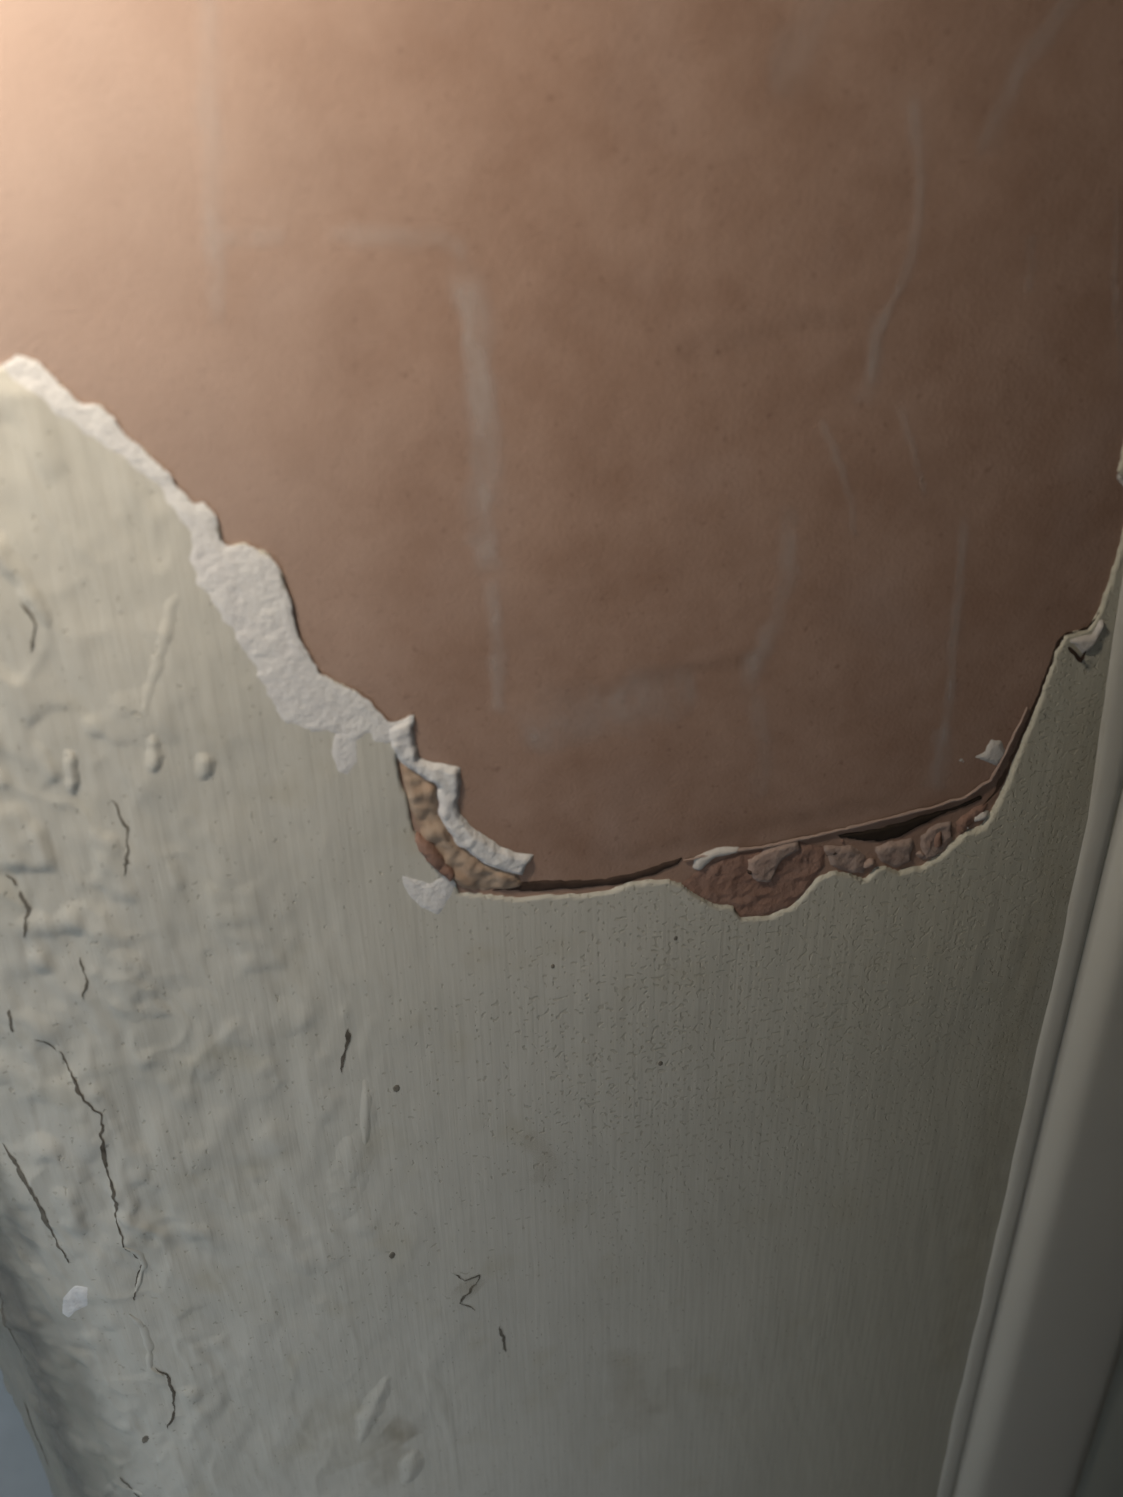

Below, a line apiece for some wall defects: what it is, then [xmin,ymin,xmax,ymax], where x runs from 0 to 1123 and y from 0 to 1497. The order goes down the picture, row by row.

peeling [0,0,1123,917]
crack [111,800,129,876]
crack [5,874,31,938]
crack [79,957,88,1000]
crack [340,1028,351,1073]
crack [0,1010,175,1429]